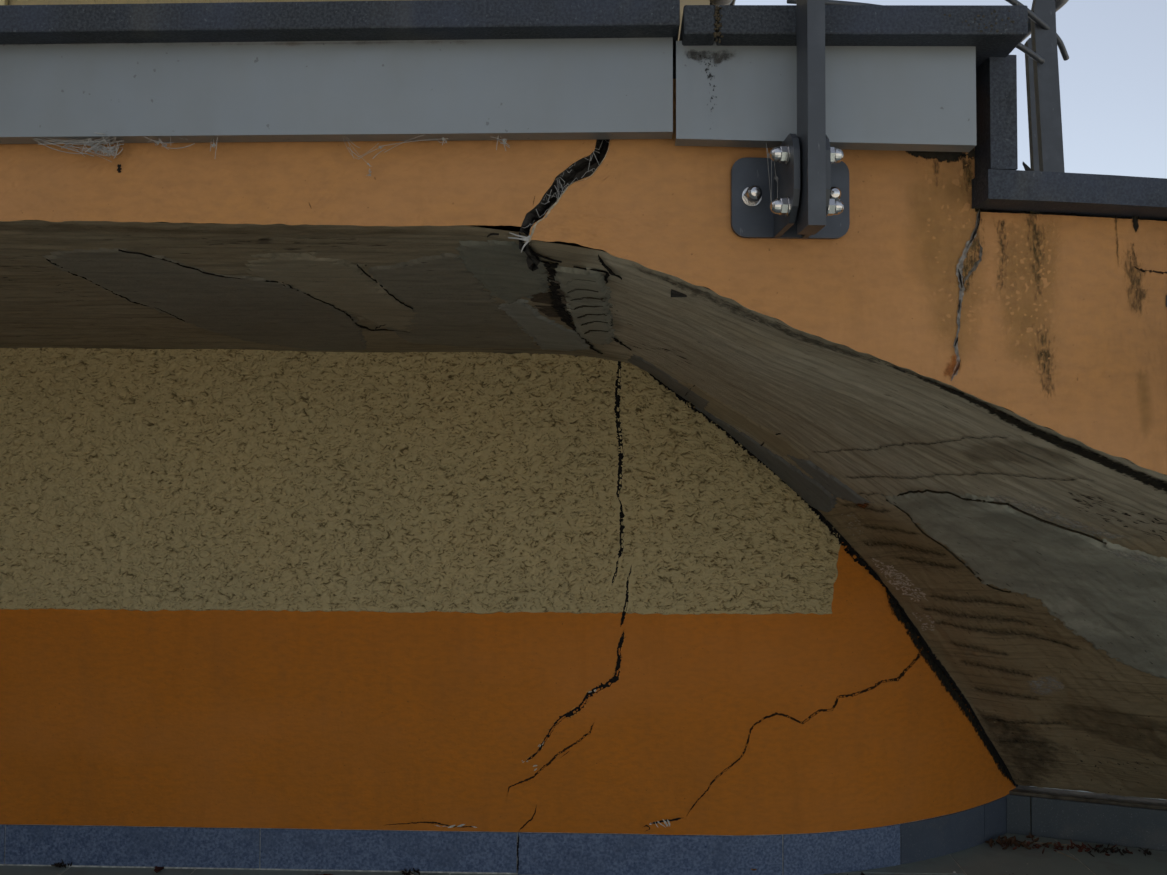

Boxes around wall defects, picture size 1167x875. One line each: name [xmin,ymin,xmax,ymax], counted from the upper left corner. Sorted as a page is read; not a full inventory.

damp [640,270,1167,494]
damp [1127,256,1167,311]
crack [487,139,1018,872]